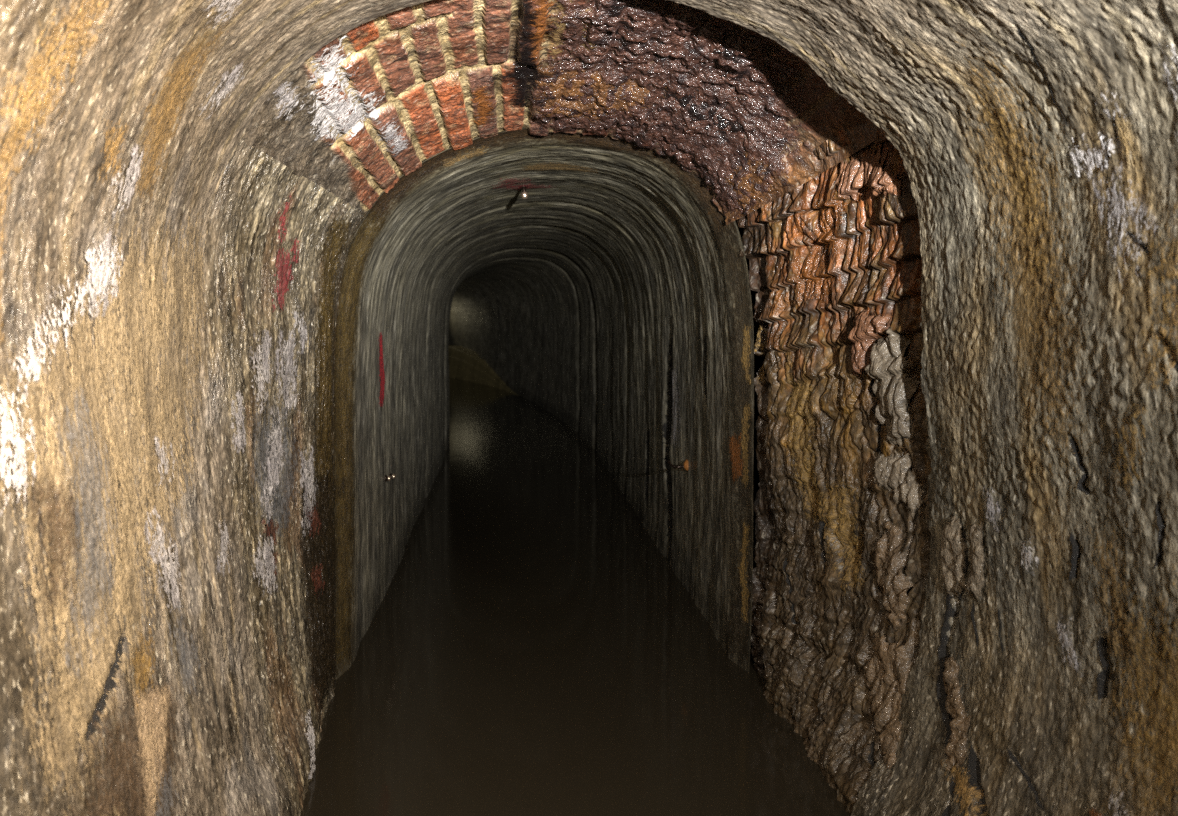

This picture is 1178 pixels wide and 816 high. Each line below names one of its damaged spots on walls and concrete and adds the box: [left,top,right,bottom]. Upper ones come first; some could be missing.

rust [529,0,573,60]
leakage [1162,44,1178,101]
leakage [1070,133,1149,277]
leakage [231,0,807,690]
leakage [216,524,232,575]
crack [936,530,1003,816]
crack [1007,749,1045,813]